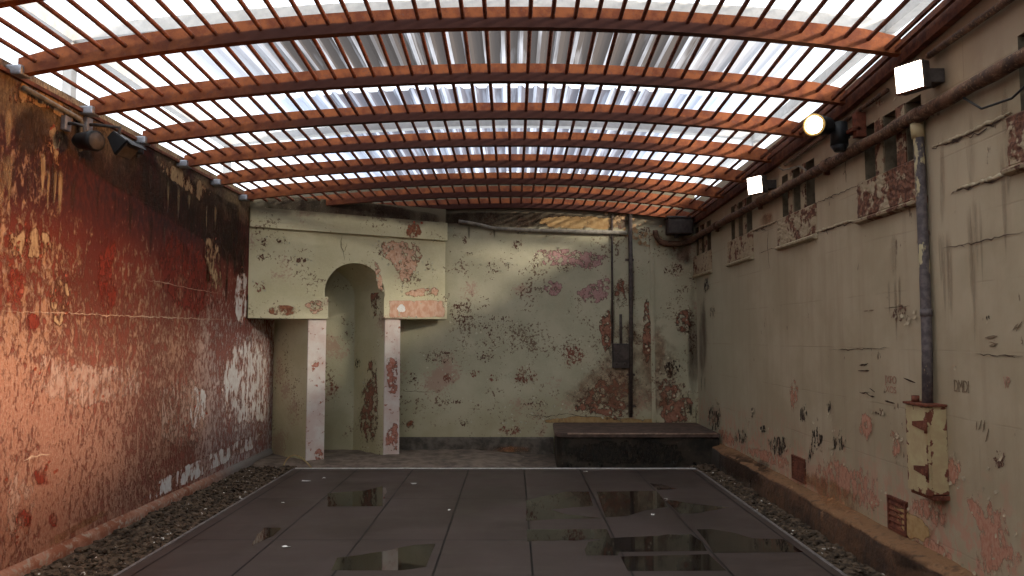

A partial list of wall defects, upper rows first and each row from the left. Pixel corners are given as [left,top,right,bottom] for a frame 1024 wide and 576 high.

crack [932,111,1012,149]
crack [952,173,1015,193]
crack [7,310,223,320]
peeling [359,238,636,454]
peeling [658,354,693,423]